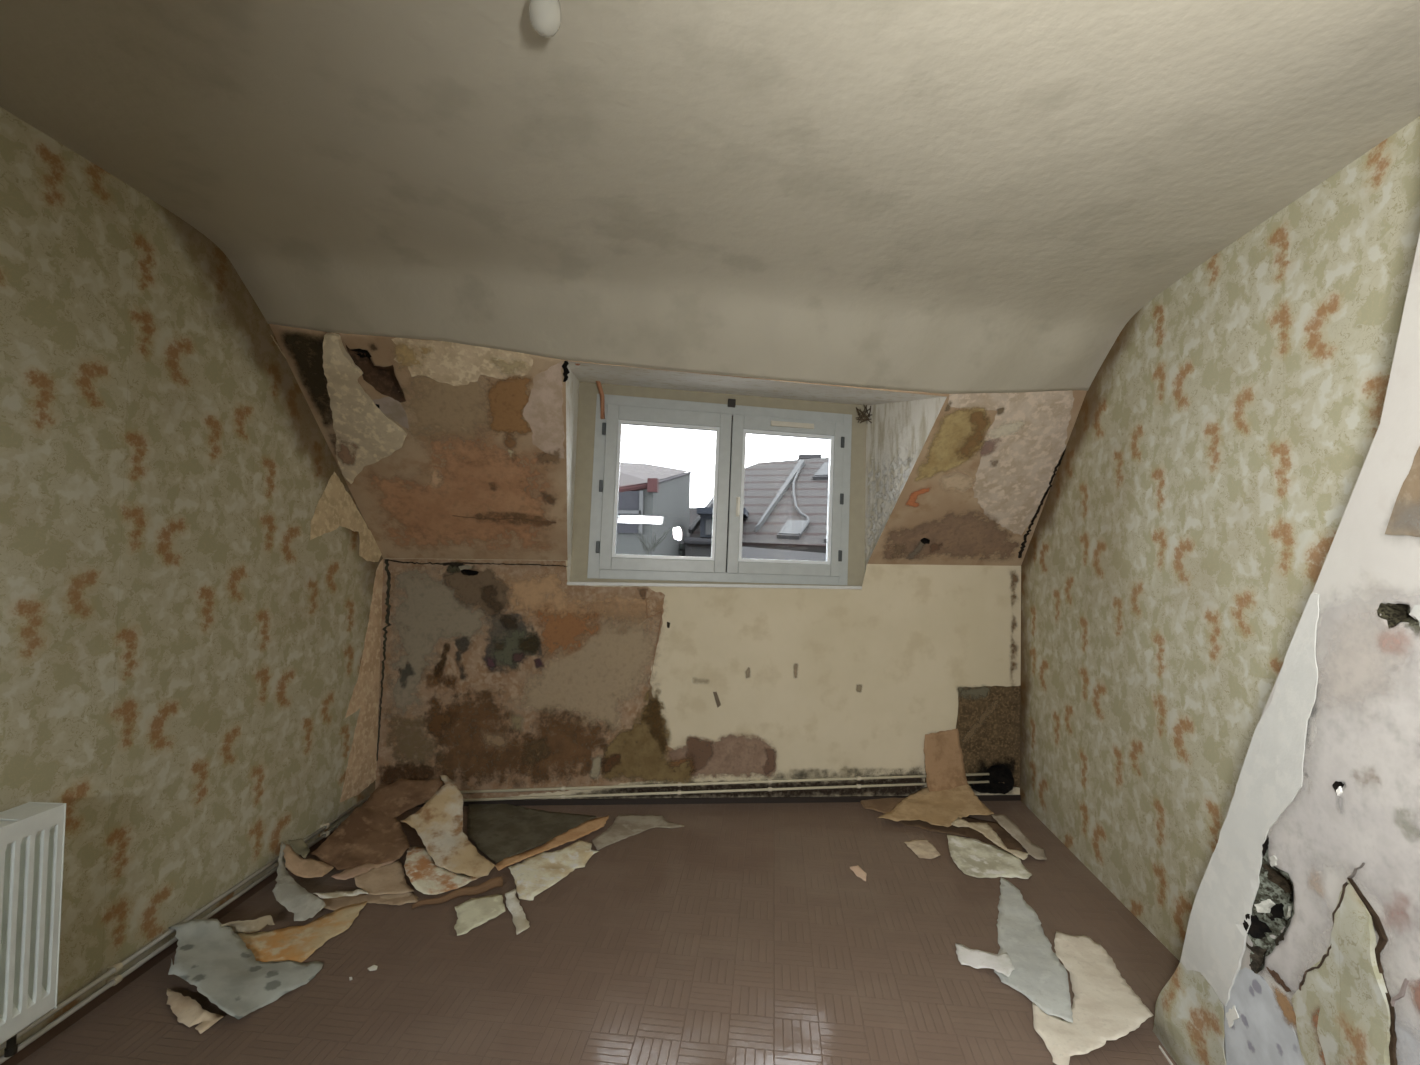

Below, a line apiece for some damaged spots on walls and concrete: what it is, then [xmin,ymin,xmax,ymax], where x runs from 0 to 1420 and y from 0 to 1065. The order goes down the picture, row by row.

peeling [391,337,565,463]
peeling [942,390,1074,535]
peeling [1385,446,1420,537]
peeling [310,472,665,802]
flaking render [1377,603,1420,634]
peeling [956,686,1020,788]
flaking render [1180,593,1320,1028]